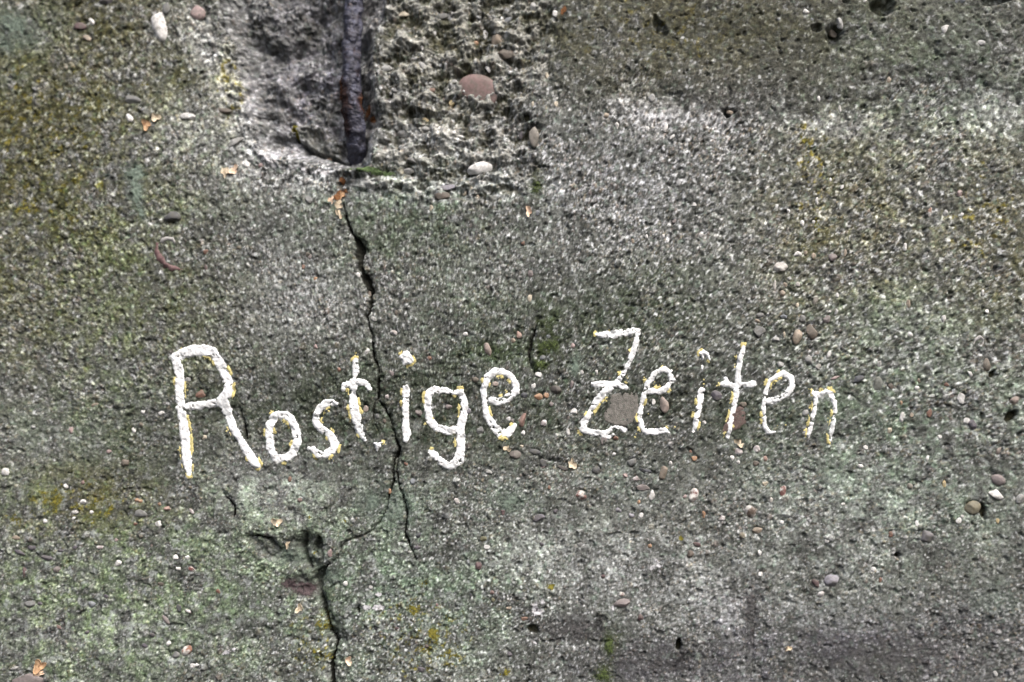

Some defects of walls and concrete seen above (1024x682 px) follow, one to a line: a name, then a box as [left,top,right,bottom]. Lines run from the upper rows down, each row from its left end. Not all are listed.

rust [339,77,376,136]
peeling [220,0,1024,209]
crack [344,207,415,555]
crack [325,607,340,682]